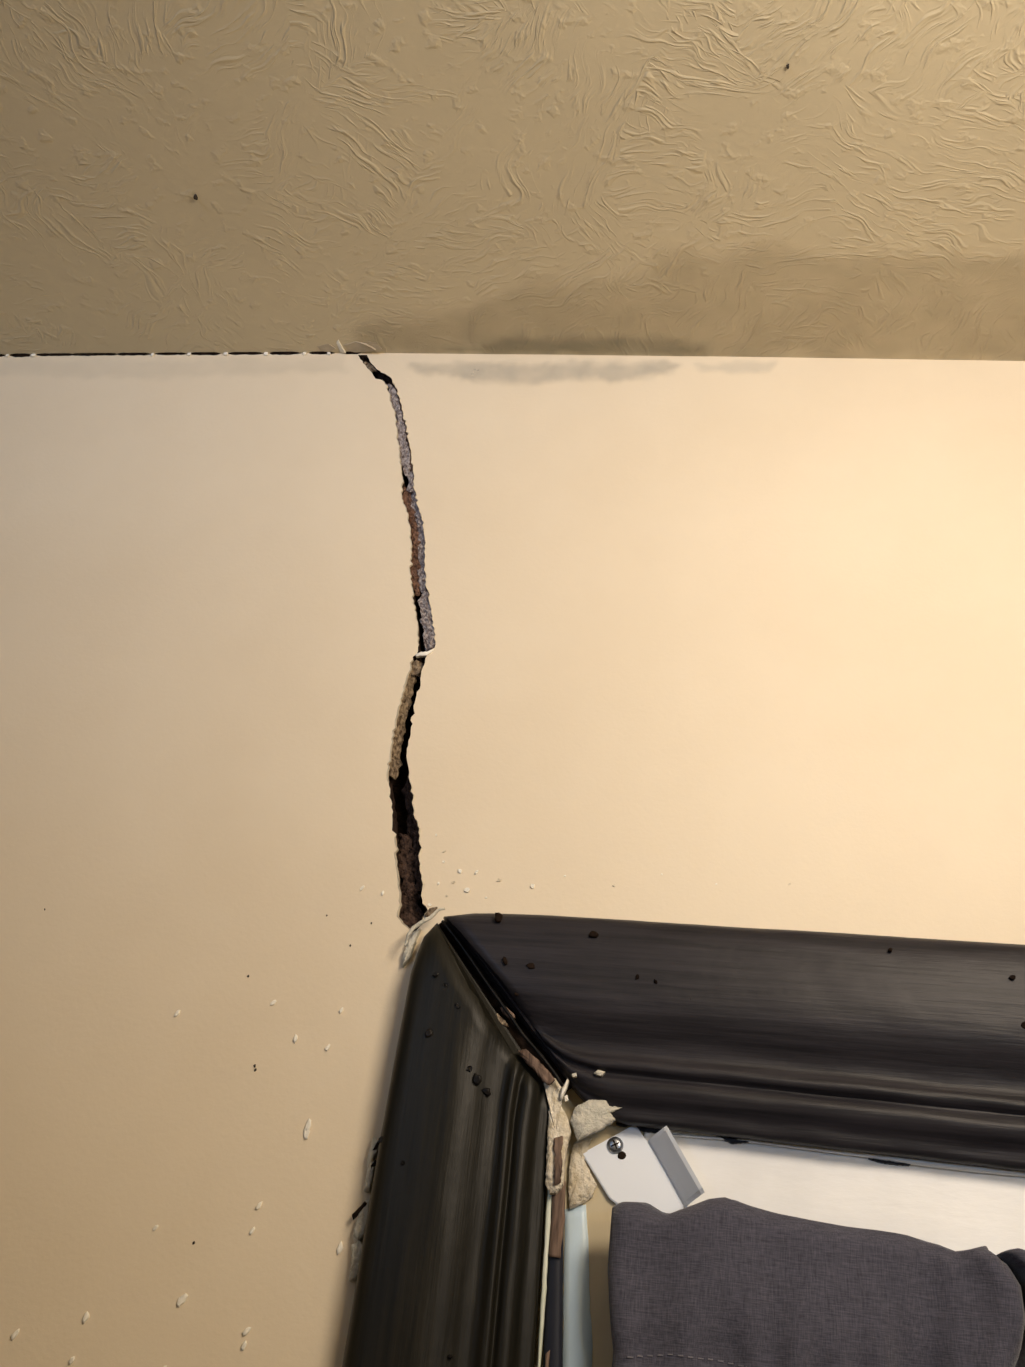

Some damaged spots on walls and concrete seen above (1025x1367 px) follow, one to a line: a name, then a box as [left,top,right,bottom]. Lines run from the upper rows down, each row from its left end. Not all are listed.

crack [0,351,572,1092]